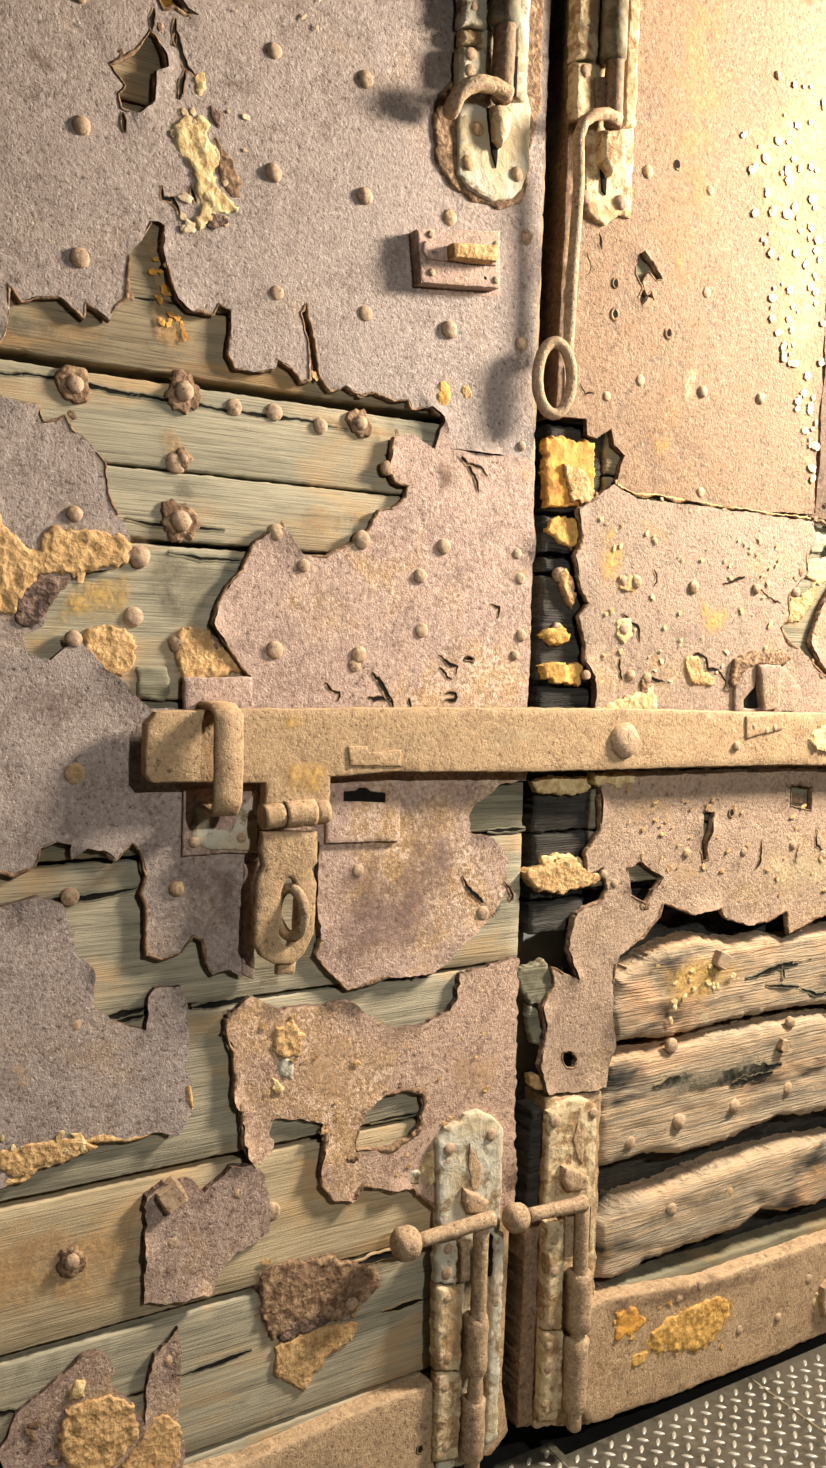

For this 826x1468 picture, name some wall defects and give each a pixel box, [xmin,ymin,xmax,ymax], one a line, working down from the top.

peeling [437,381,472,406]
corrosion [174,627,243,680]
peeling [271,1019,306,1096]
peeling [409,1150,435,1186]
corrosion [657,1276,756,1301]